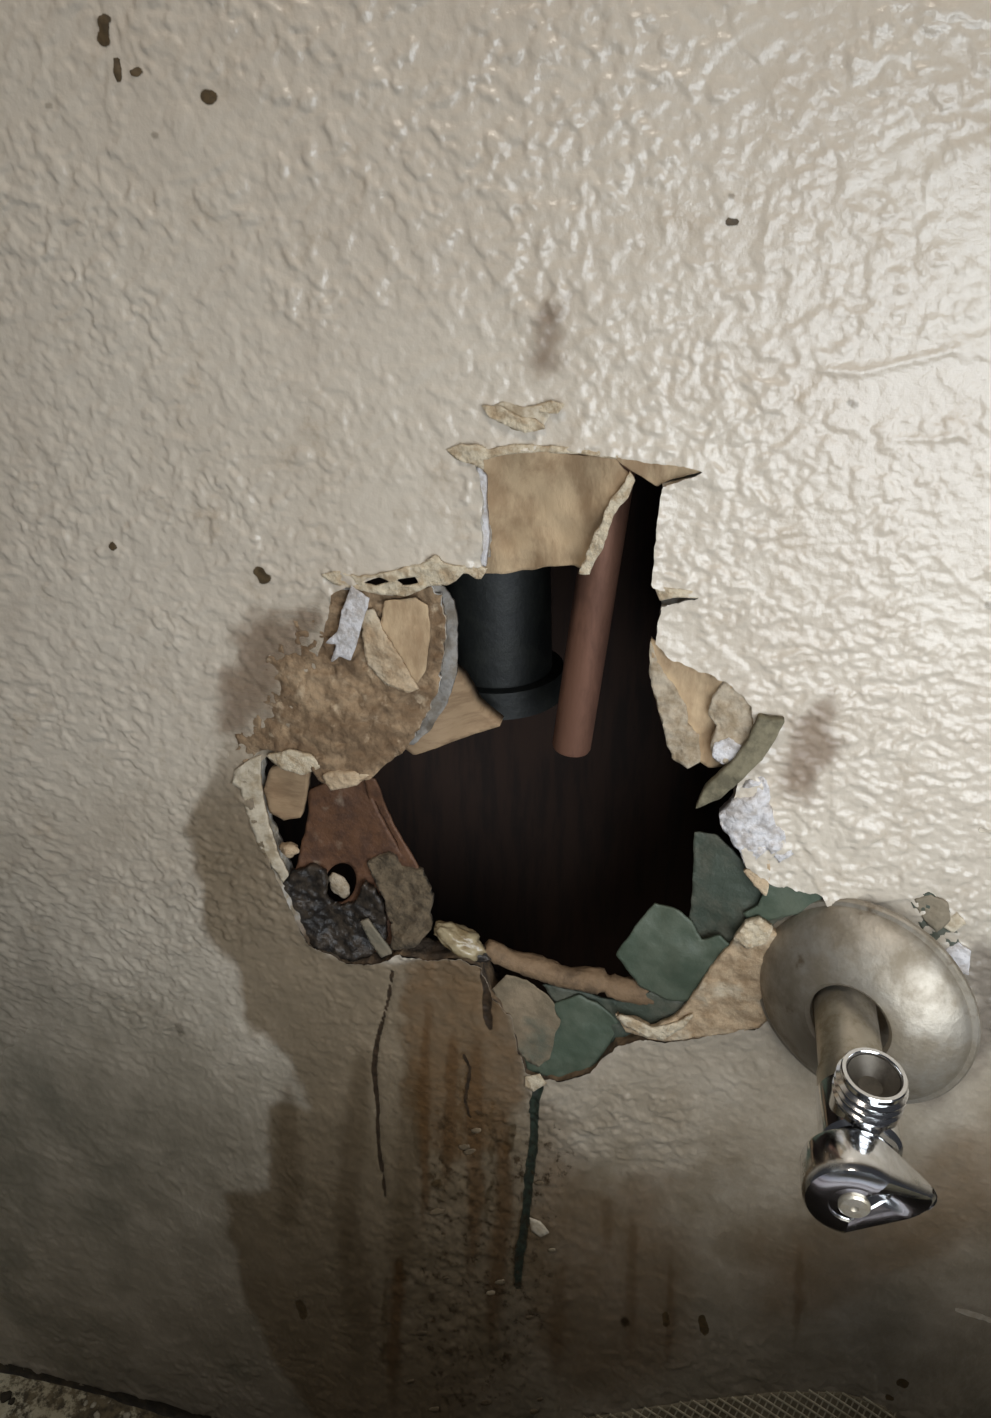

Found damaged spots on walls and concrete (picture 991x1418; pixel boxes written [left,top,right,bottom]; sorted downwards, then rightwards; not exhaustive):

spalling [232,400,823,1082]
peeling [911,892,971,987]
water stain [189,800,521,1418]
crack [371,971,394,1197]
crack [514,1074,549,1289]